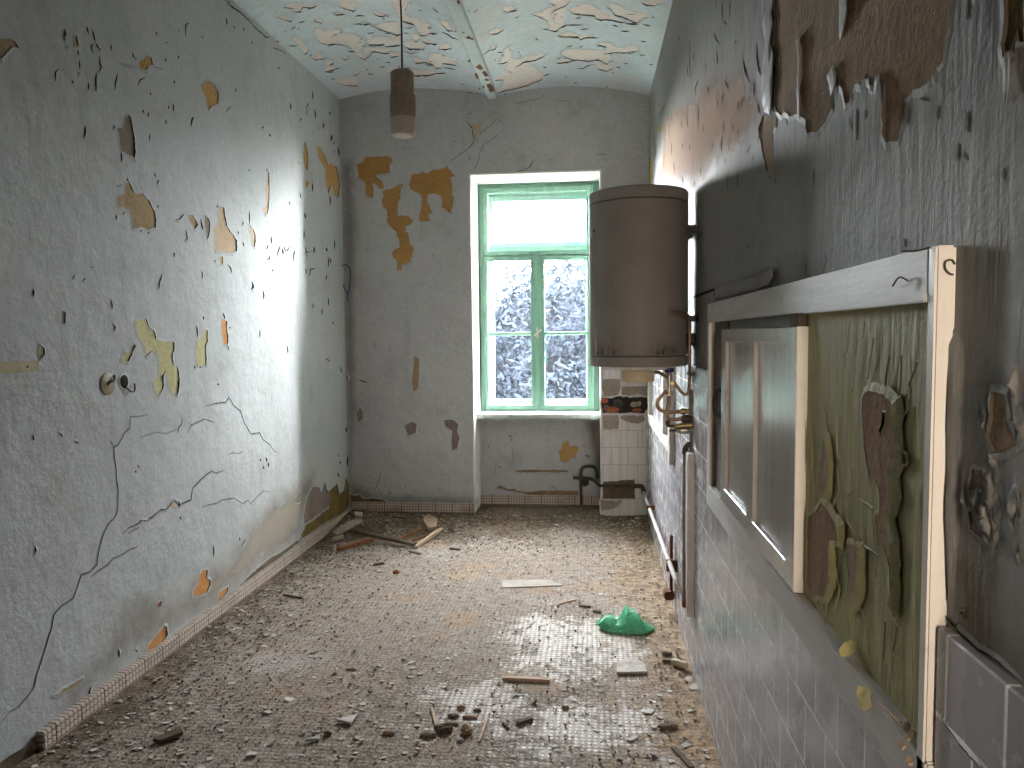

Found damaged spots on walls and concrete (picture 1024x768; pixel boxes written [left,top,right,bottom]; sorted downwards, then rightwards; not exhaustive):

peeling [113,110,150,163]
peeling [270,0,458,87]
crack [449,95,571,173]
peeling [483,0,663,95]
peeling [737,0,967,187]
peeling [115,178,159,235]
peeling [175,169,336,280]
peeling [355,155,457,273]
peeling [119,316,181,398]
peeling [807,321,918,660]
crack [0,397,279,724]
flaking render [135,455,388,653]